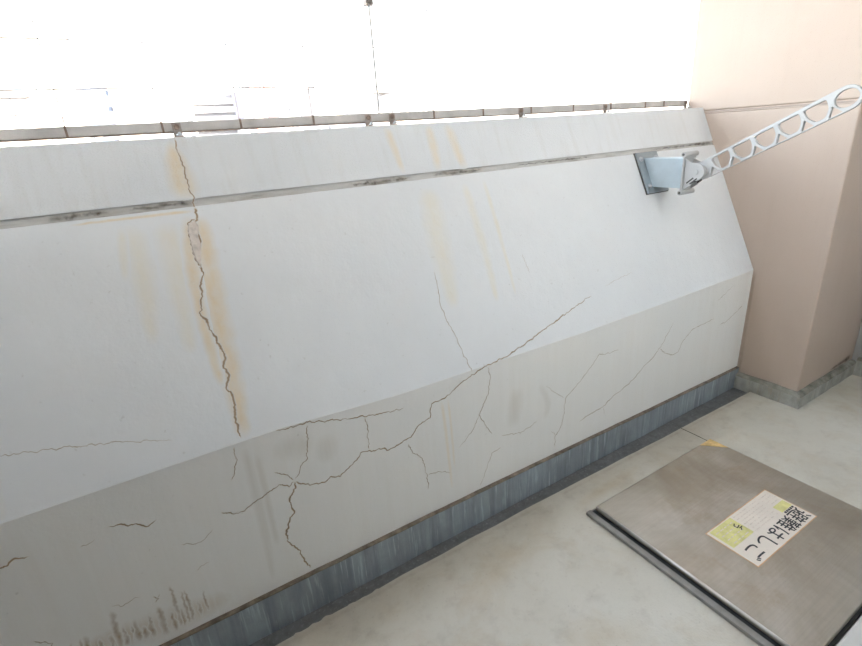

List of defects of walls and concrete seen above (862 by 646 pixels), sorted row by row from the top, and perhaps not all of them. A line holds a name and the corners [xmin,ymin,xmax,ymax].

crack [0,556,30,569]
crack [2,440,171,457]
damp [69,586,232,646]
rust [69,141,252,439]
crack [174,139,241,480]
crack [181,273,742,568]